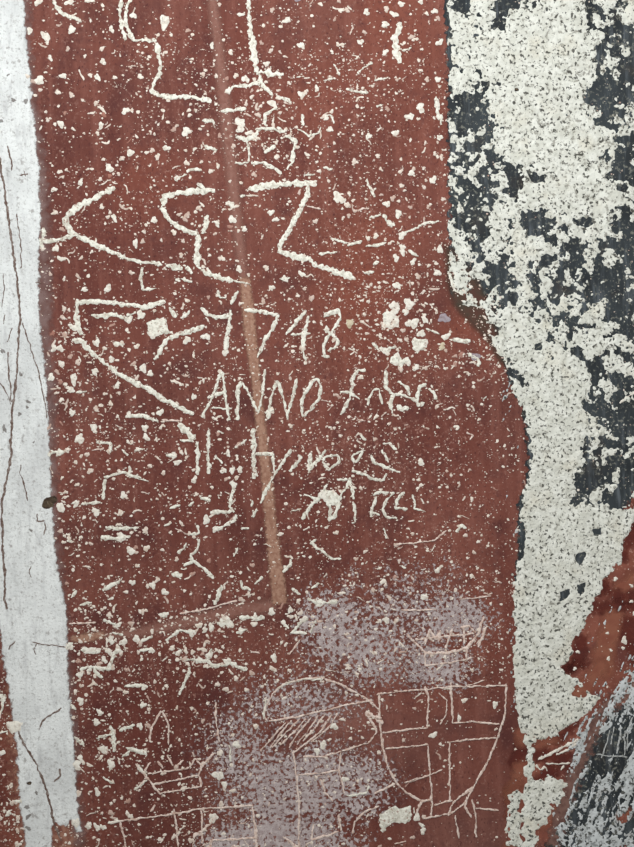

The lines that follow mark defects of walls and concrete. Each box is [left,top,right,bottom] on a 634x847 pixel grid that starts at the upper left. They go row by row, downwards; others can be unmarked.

peeling [404,103,424,120]
crack [0,146,47,610]
flaking render [431,0,634,847]
crack [8,642,65,654]
crack [18,708,62,840]